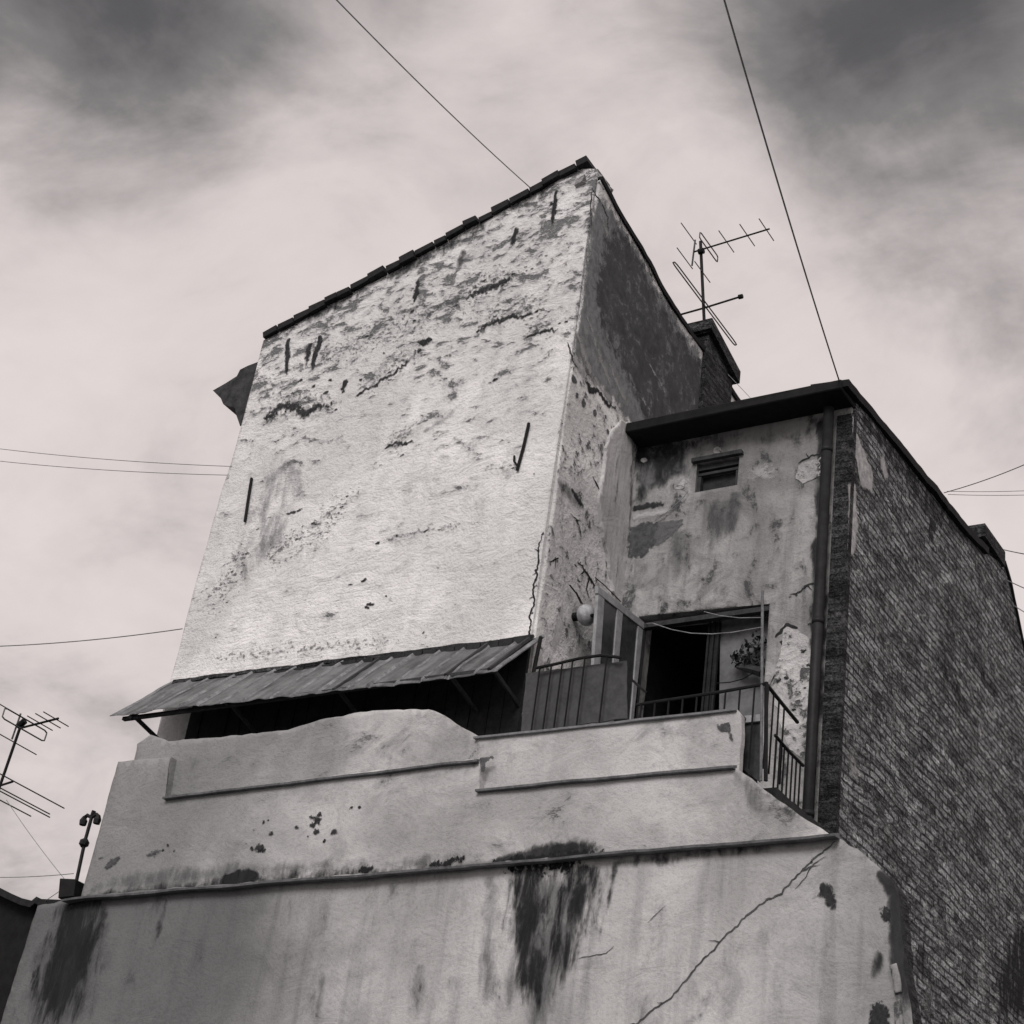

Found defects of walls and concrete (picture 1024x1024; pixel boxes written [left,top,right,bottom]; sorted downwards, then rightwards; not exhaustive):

peeling [326,199,702,422]
peeling [385,424,414,456]
spalling [795,457,821,484]
crack [528,532,596,635]
spalling [772,623,811,757]
spalling [250,819,273,853]
spalling [295,812,337,843]
leakage [32,890,112,1022]
leakage [492,842,604,1024]
crack [632,841,835,1024]